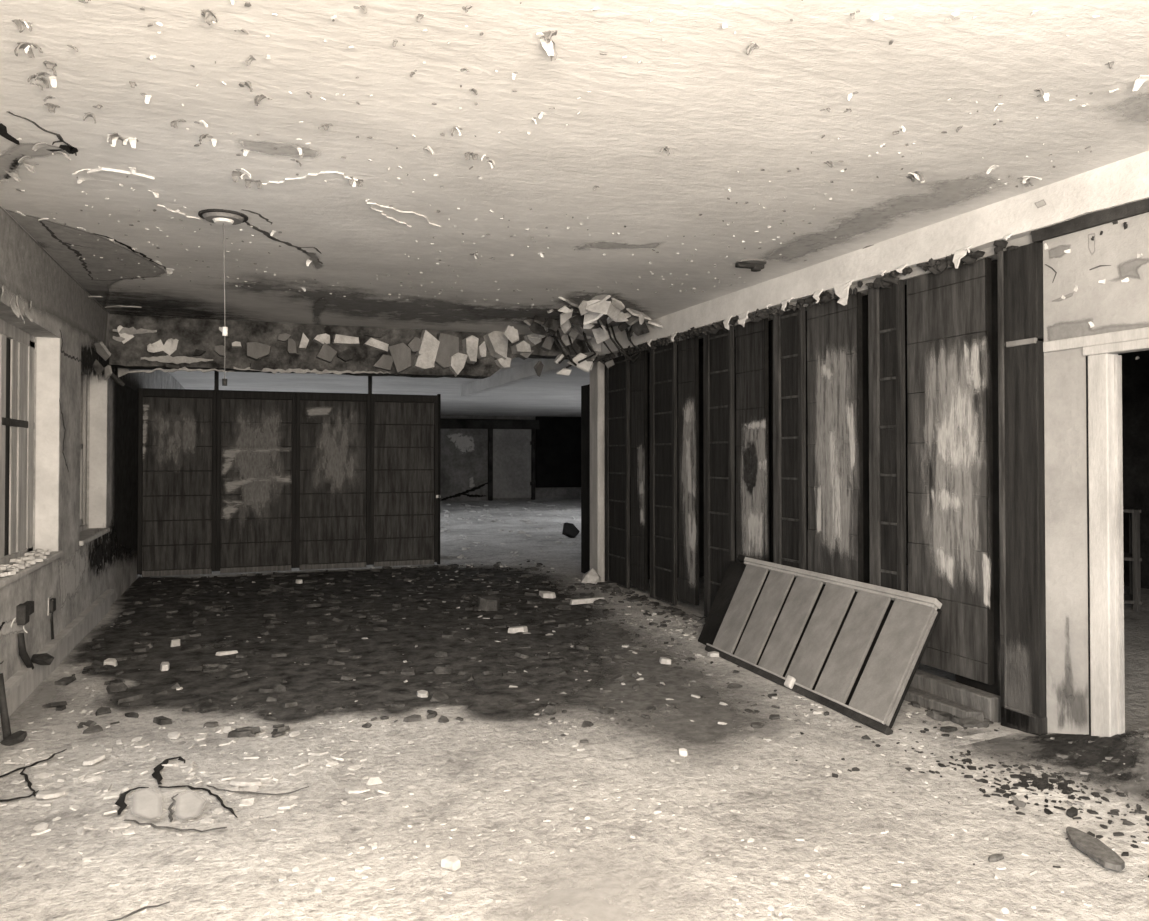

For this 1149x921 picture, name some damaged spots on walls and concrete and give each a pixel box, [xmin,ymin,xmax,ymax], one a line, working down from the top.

peeling [539,30,557,61]
crack [8,111,77,156]
spalling [0,123,91,184]
peeling [107,133,138,148]
peeling [767,165,999,260]
crack [242,209,323,292]
peeling [1119,253,1149,282]
peeling [0,207,1019,387]
peeling [1048,319,1149,341]
crack [0,749,67,802]
crack [115,756,309,832]
crack [108,901,170,921]